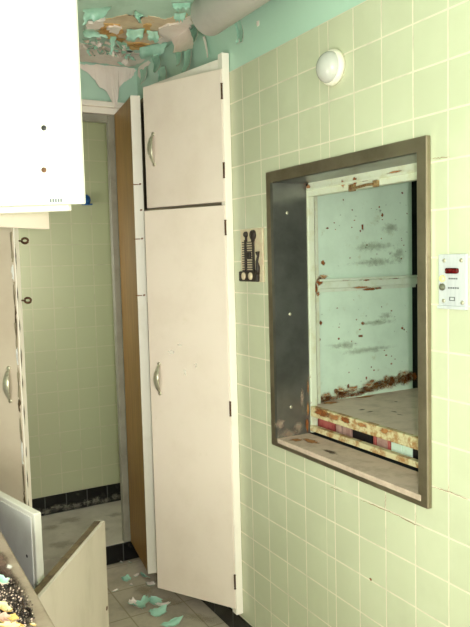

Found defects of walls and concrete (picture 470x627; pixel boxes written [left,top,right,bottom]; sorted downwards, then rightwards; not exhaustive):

peeling [79,2,209,108]
rust [292,371,417,443]
crack [361,495,418,526]